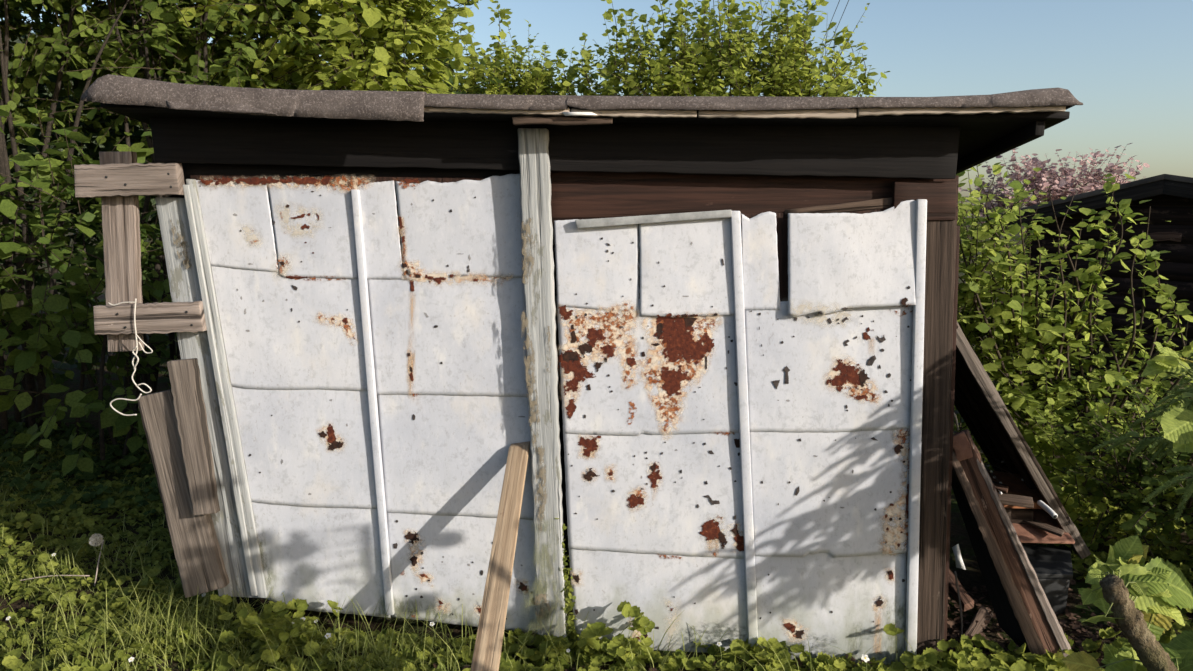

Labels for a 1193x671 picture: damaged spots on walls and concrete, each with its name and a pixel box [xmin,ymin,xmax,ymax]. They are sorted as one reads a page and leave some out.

corrosion [200,175,368,196]
corrosion [273,204,343,281]
corrosion [399,216,511,320]
corrosion [558,303,718,435]
corrosion [826,359,879,402]
corrosion [318,424,344,451]
corrosion [578,436,614,482]
corrosion [627,461,662,508]
corrosion [881,429,910,554]
corrosion [401,531,432,582]
corrosion [700,515,744,556]
corrosion [784,619,804,640]